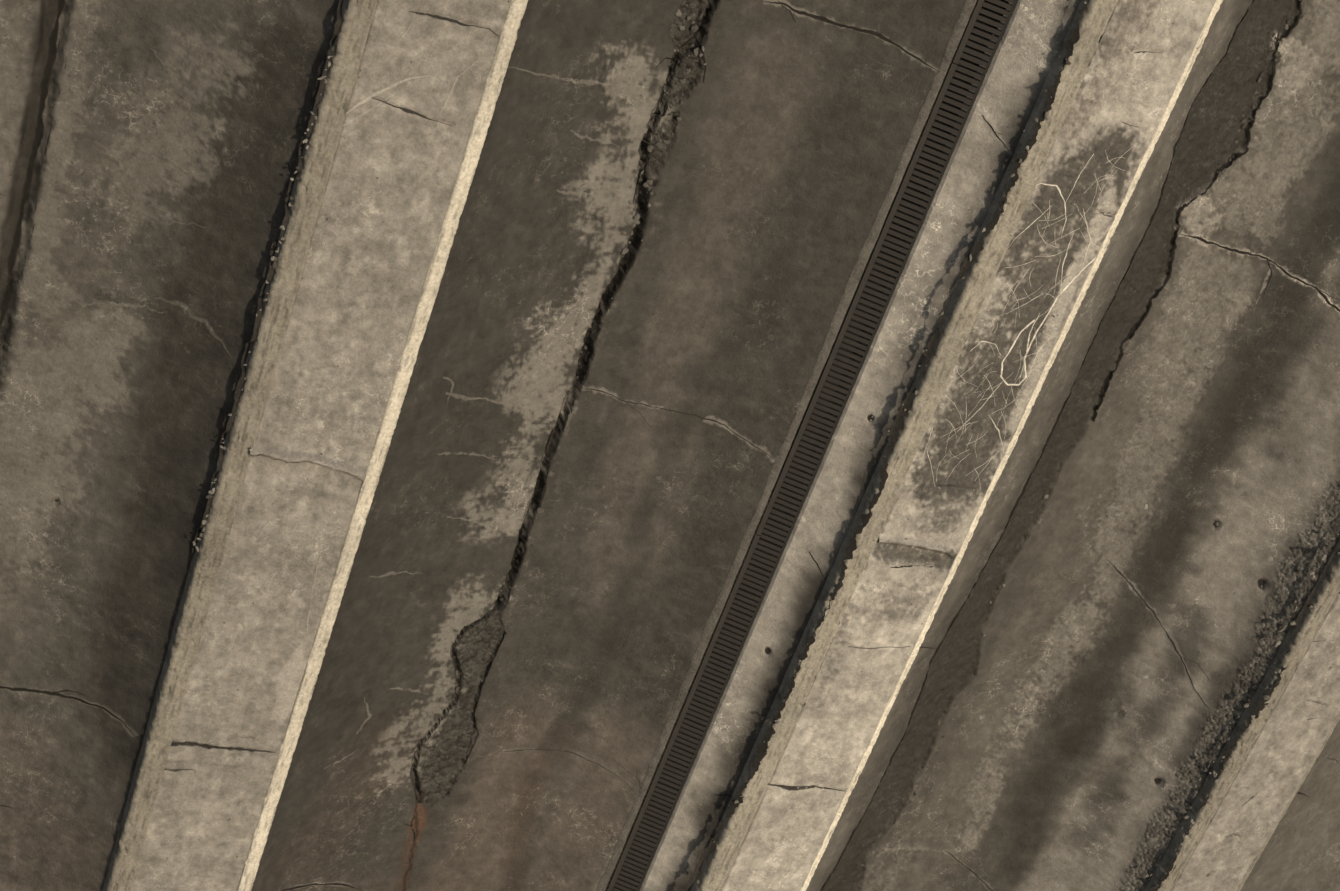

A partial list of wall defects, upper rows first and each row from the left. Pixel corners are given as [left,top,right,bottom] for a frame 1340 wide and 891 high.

crack [0,684,275,772]
rust [251,796,549,891]
spalling [410,599,508,811]
leakage [324,14,692,891]
crack [404,0,777,860]
leakage [487,223,820,891]
spalling [631,0,707,224]
crack [687,0,1089,891]
spalling [821,0,1304,891]
leakage [851,0,1340,891]
crack [1105,468,1340,891]
crack [1178,231,1340,317]